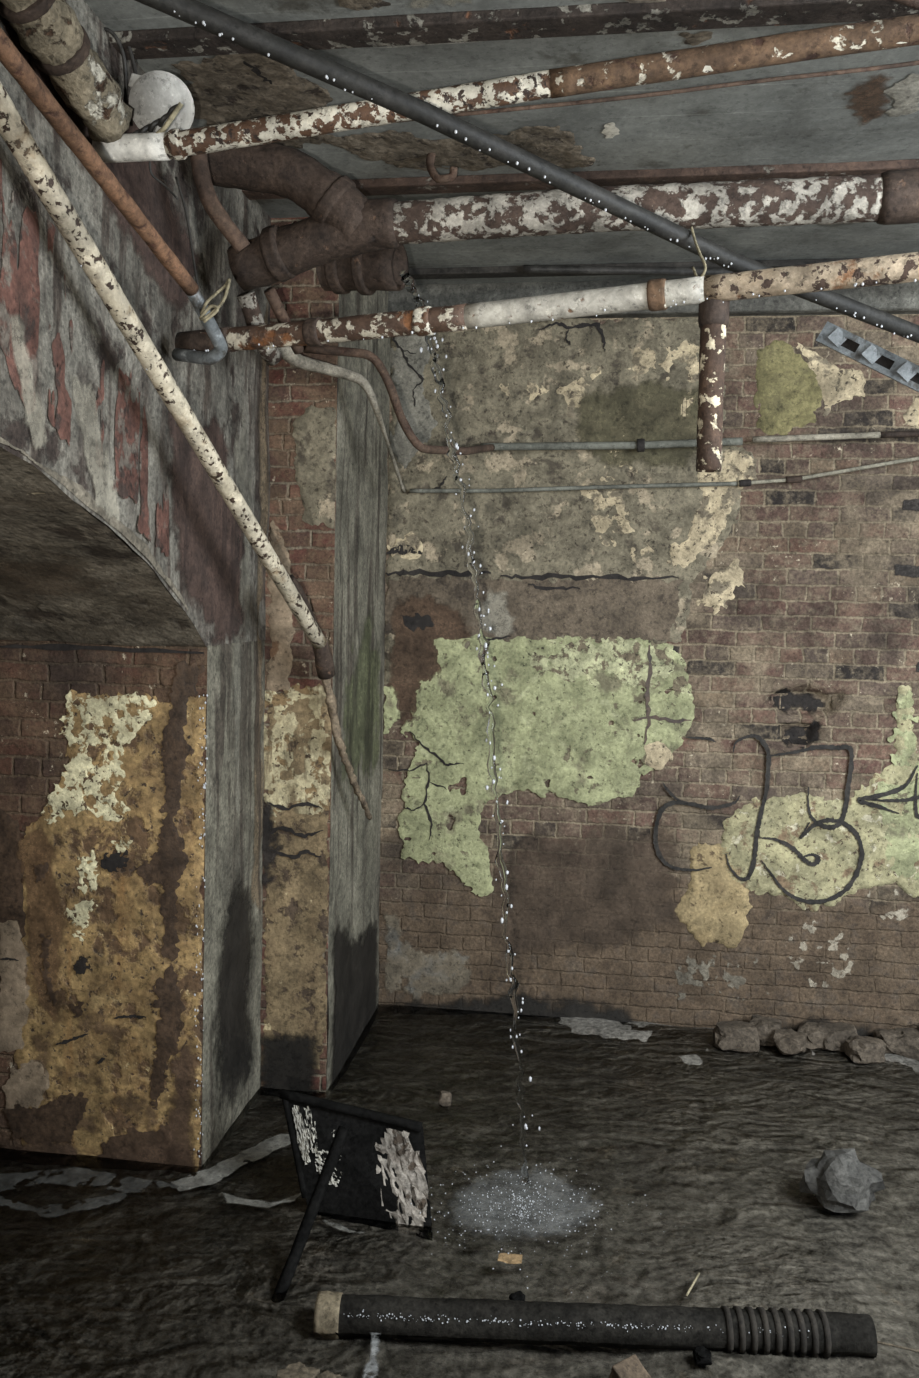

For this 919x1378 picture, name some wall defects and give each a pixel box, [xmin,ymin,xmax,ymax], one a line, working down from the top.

flaking render [750,340,866,435]
crack [477,634,512,642]
flaking render [383,317,758,897]
peeling [0,689,206,1172]
crack [388,731,464,840]
flaking render [674,685,919,948]